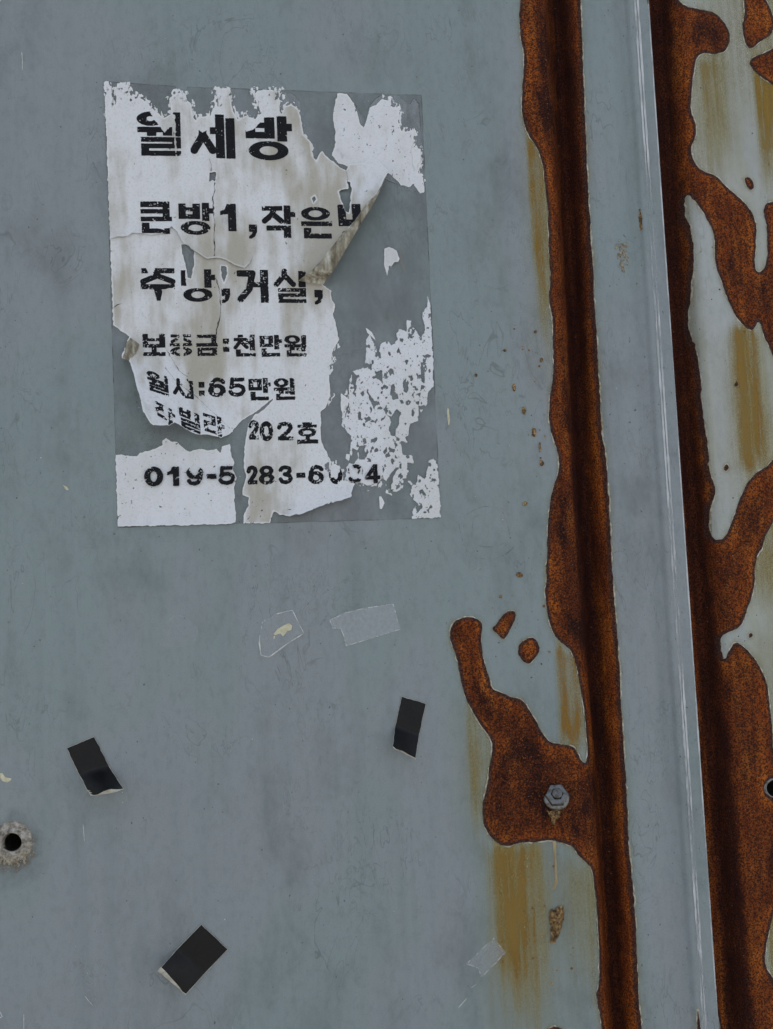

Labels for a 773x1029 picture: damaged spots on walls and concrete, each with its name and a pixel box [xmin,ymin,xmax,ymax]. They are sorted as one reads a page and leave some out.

rust [449,0,643,1029]
rust [649,0,773,1029]